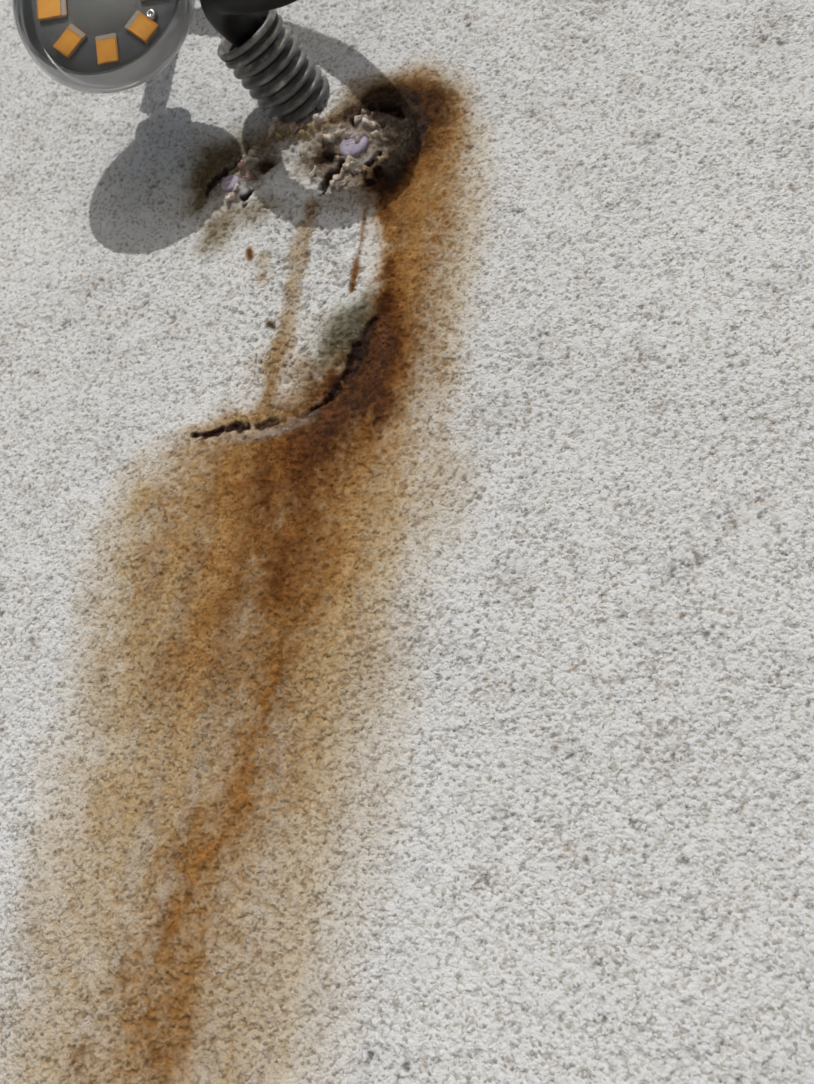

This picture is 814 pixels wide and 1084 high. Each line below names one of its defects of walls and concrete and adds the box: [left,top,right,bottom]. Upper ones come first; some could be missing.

spalling [207,106,404,208]
crack [192,317,378,439]
rust [89,77,463,1084]